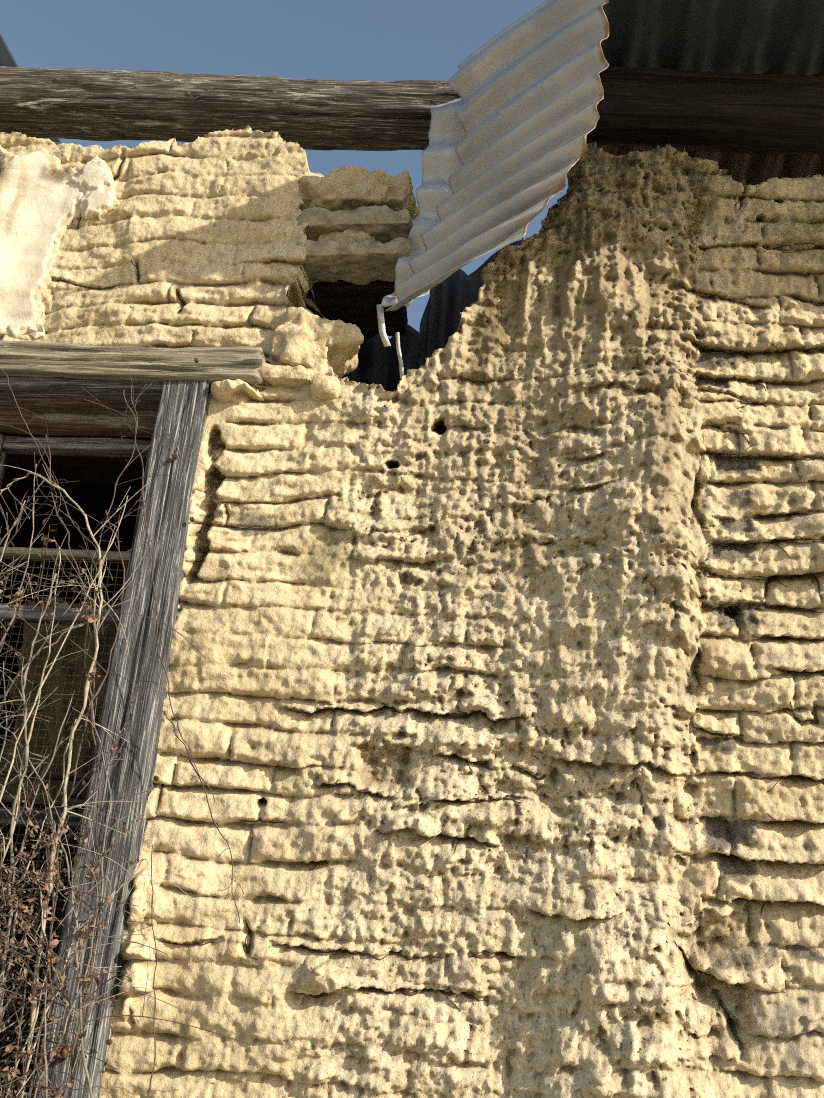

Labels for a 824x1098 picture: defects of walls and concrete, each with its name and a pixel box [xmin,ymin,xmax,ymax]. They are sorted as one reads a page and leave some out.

water stain [45,167,73,180]
peeling [0,145,120,340]
crack [715,991,741,1045]